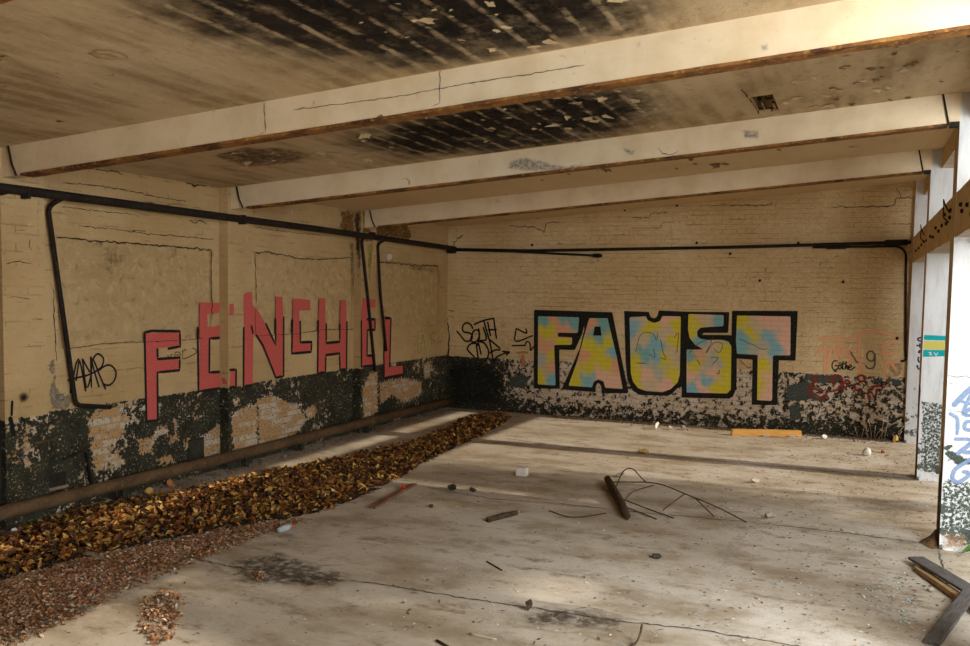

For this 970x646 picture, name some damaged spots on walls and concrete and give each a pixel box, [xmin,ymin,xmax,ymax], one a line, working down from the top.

damp [219,148,302,166]
peeling [87,402,126,476]
peeling [136,393,317,467]
peeling [920,401,970,472]
peeling [940,479,970,546]